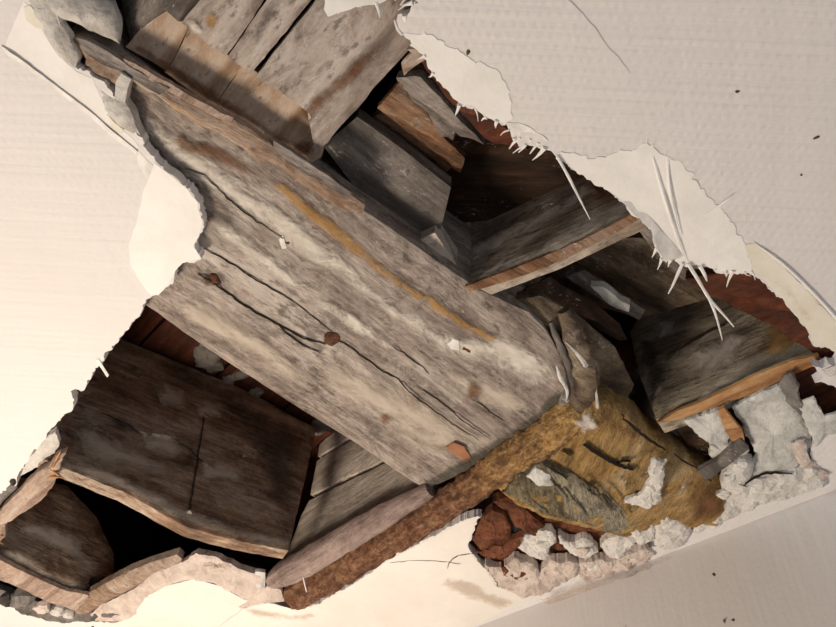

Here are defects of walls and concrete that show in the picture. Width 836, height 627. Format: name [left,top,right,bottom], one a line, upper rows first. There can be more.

flaking render [4,0,149,149]
peeling [324,0,386,17]
flaking render [128,163,202,295]
peeling [404,32,836,353]
flaking render [0,426,61,505]
flaking render [0,453,829,627]
crack [393,551,481,566]